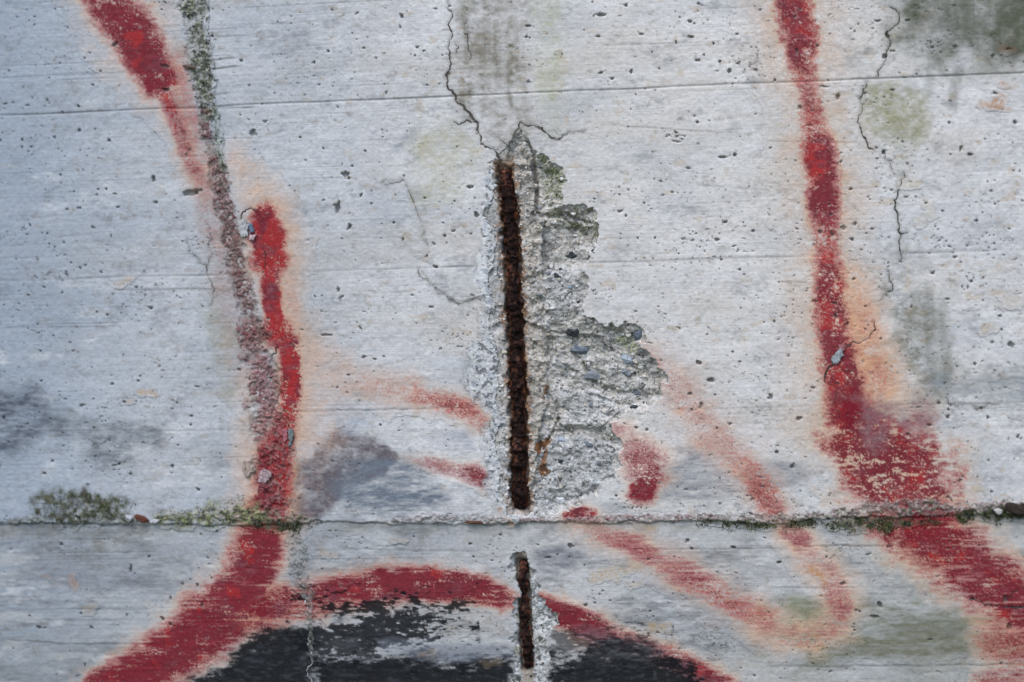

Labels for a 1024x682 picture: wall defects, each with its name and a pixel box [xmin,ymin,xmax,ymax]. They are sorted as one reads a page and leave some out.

crack [445,8,585,161]
spalling [390,130,1024,525]
crack [824,6,909,418]
spalling [508,551,559,682]